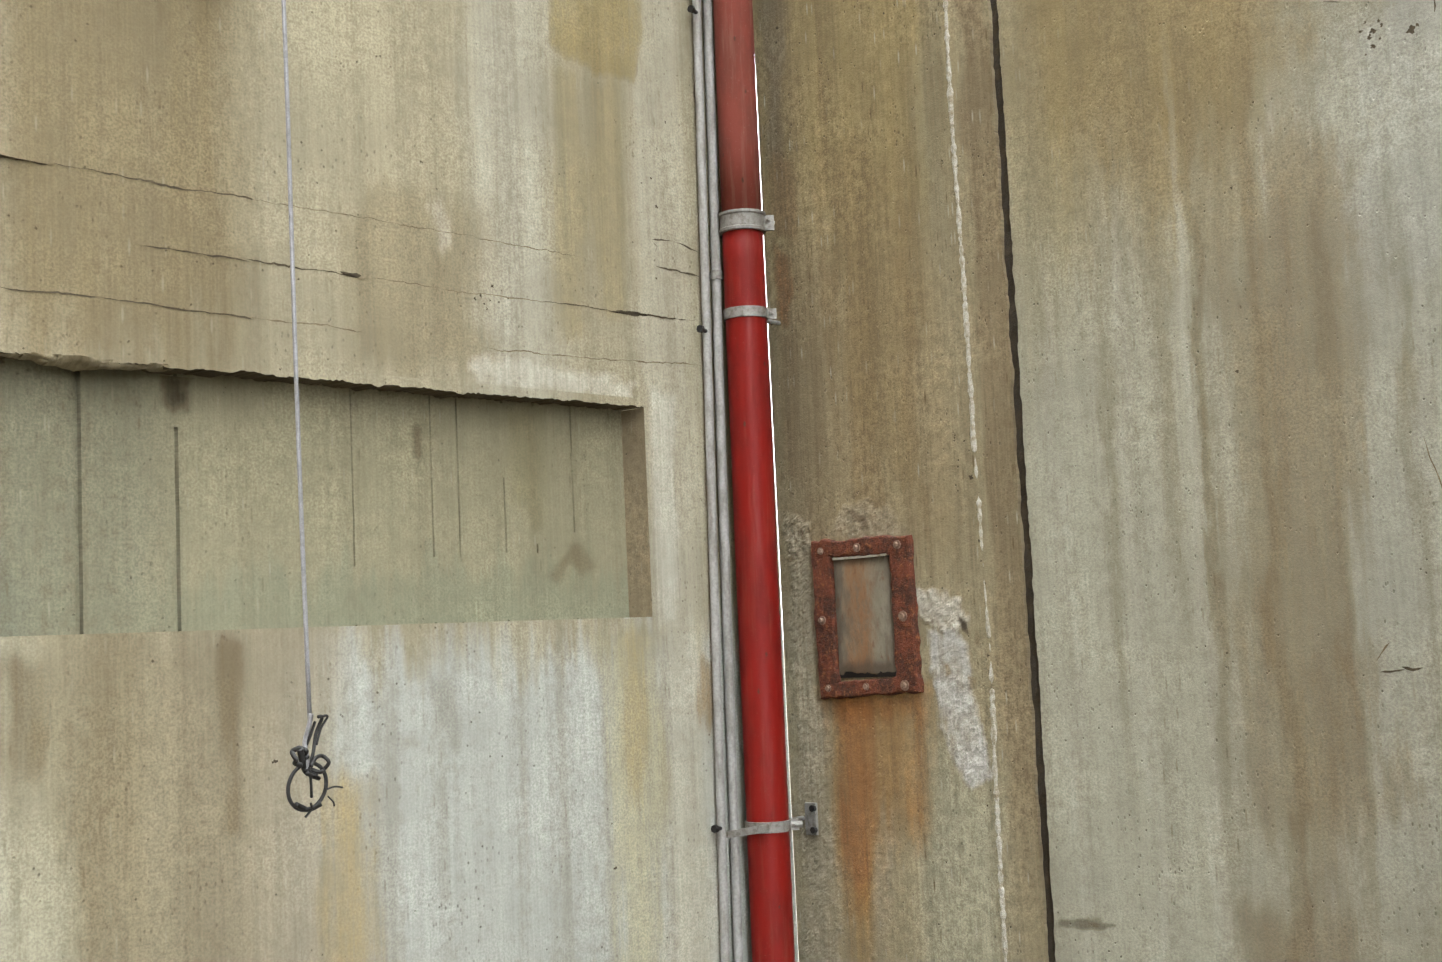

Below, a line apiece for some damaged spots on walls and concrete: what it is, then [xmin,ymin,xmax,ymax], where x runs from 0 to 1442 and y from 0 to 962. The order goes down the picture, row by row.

crack [1,287,360,332]
crack [0,156,574,256]
damp [329,0,687,962]
crack [490,348,700,366]
damp [943,0,978,480]
rust [815,663,946,962]
damp [983,581,1008,962]